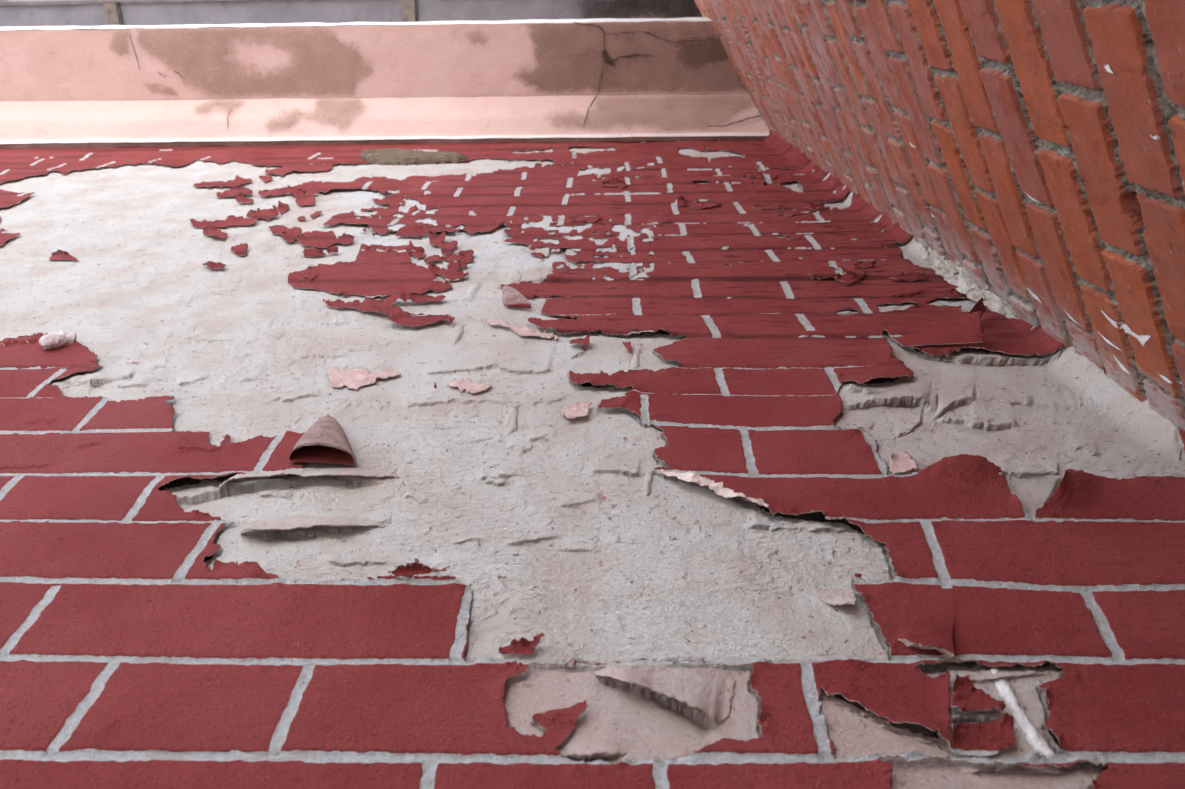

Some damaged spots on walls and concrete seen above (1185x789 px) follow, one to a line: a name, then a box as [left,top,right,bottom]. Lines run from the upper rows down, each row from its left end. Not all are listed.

water stain [112,27,369,126]
crack [548,22,714,127]
water stain [519,0,749,127]
spalling [1124,192,1144,226]
peeling [832,215,1185,518]
peeling [0,146,896,764]
peeling [818,665,1108,789]